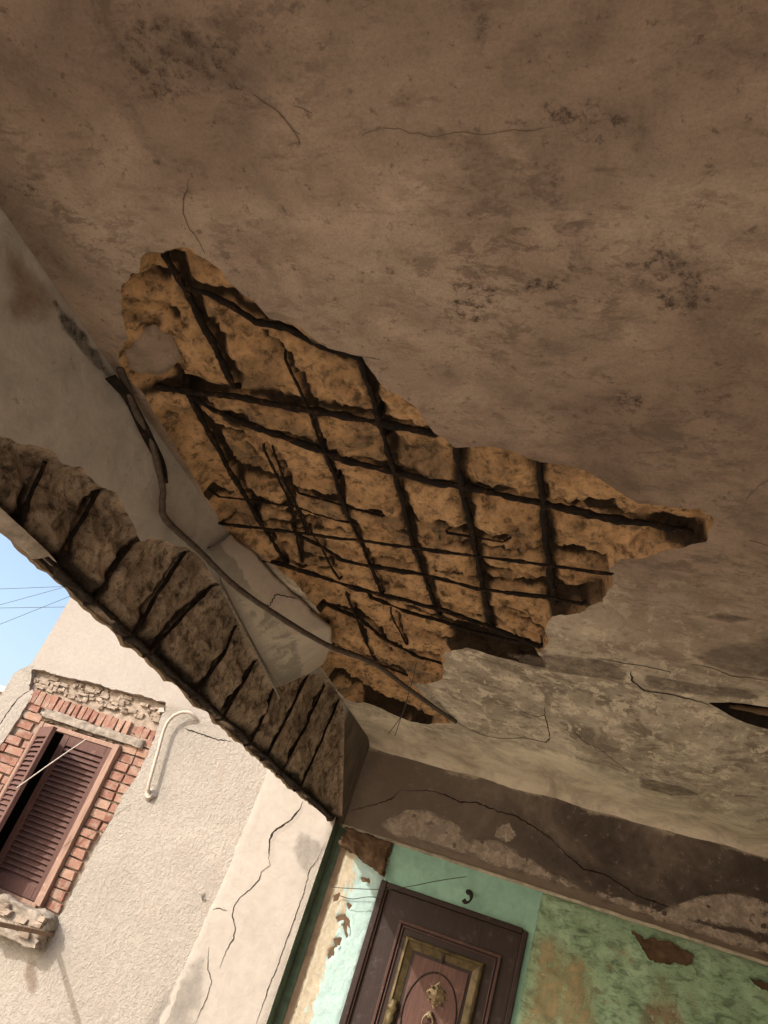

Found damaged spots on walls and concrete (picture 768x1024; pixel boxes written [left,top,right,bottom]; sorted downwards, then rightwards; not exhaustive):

crack [254,95,311,147]
crack [363,127,539,137]
spalling [0,247,714,822]
crack [553,658,768,705]
flaking render [0,672,166,915]
peeling [384,810,569,887]
crack [351,784,737,934]
crack [196,802,305,1022]
crack [256,843,325,1023]
peeling [328,893,352,959]
peeling [630,930,695,967]
peeling [600,892,768,953]